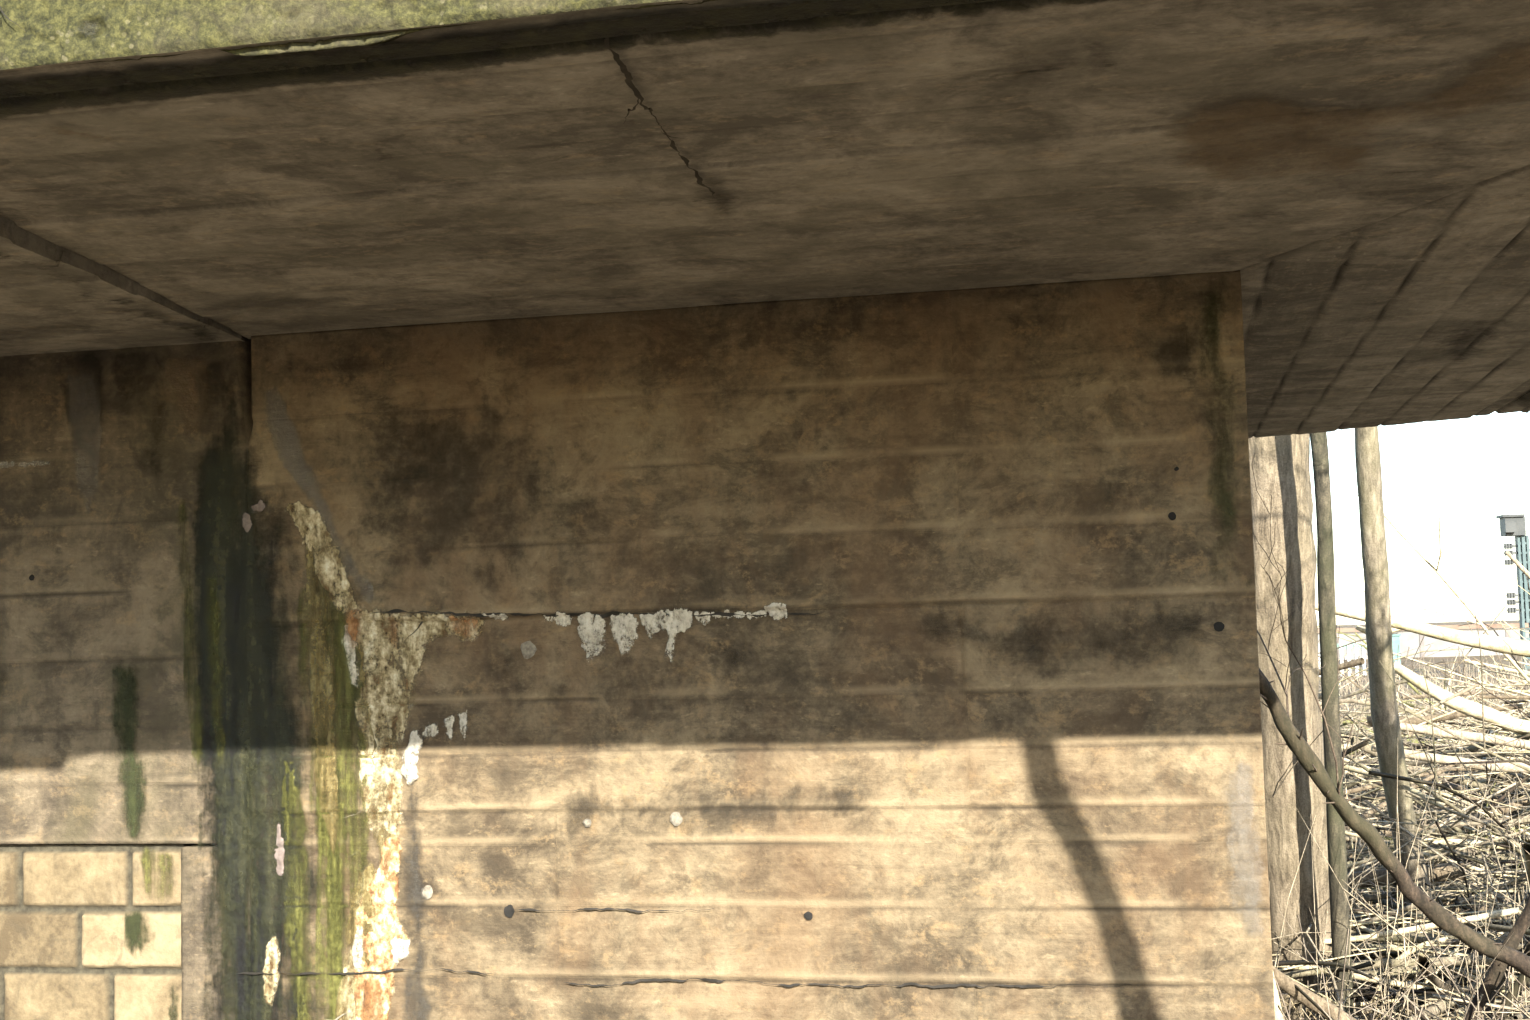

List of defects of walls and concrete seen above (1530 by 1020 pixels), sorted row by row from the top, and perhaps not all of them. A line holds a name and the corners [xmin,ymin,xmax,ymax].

crack [603,37,716,199]
peeling [242,500,265,533]
leakage [543,602,787,662]
leakage [182,365,414,1020]
leakage [112,667,171,889]
peeling [352,710,467,1020]
leakage [407,831,424,927]
peeling [263,937,280,1005]
leakage [406,947,430,1020]